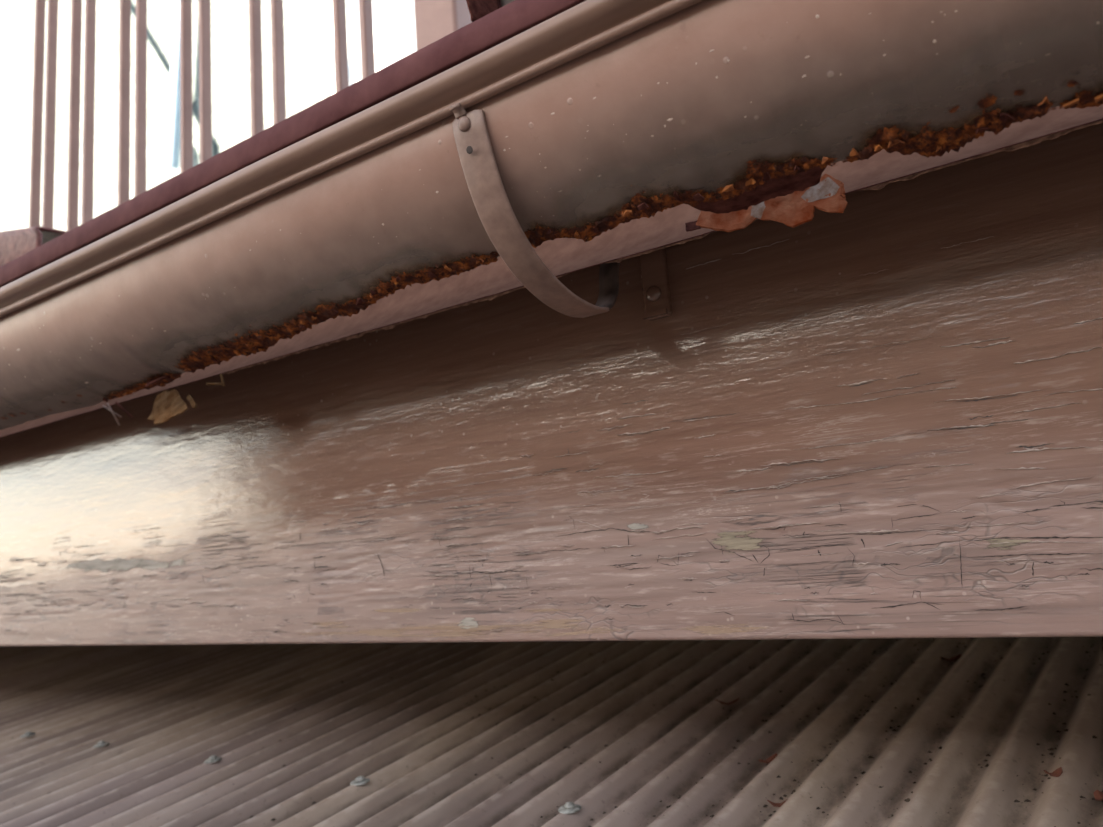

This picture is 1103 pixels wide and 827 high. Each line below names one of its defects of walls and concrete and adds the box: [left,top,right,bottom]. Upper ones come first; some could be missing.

peeling [685,166,847,233]
corrosion [524,79,1103,248]
corrosion [102,251,500,402]
crack [813,336,1103,363]
crack [0,373,1103,641]